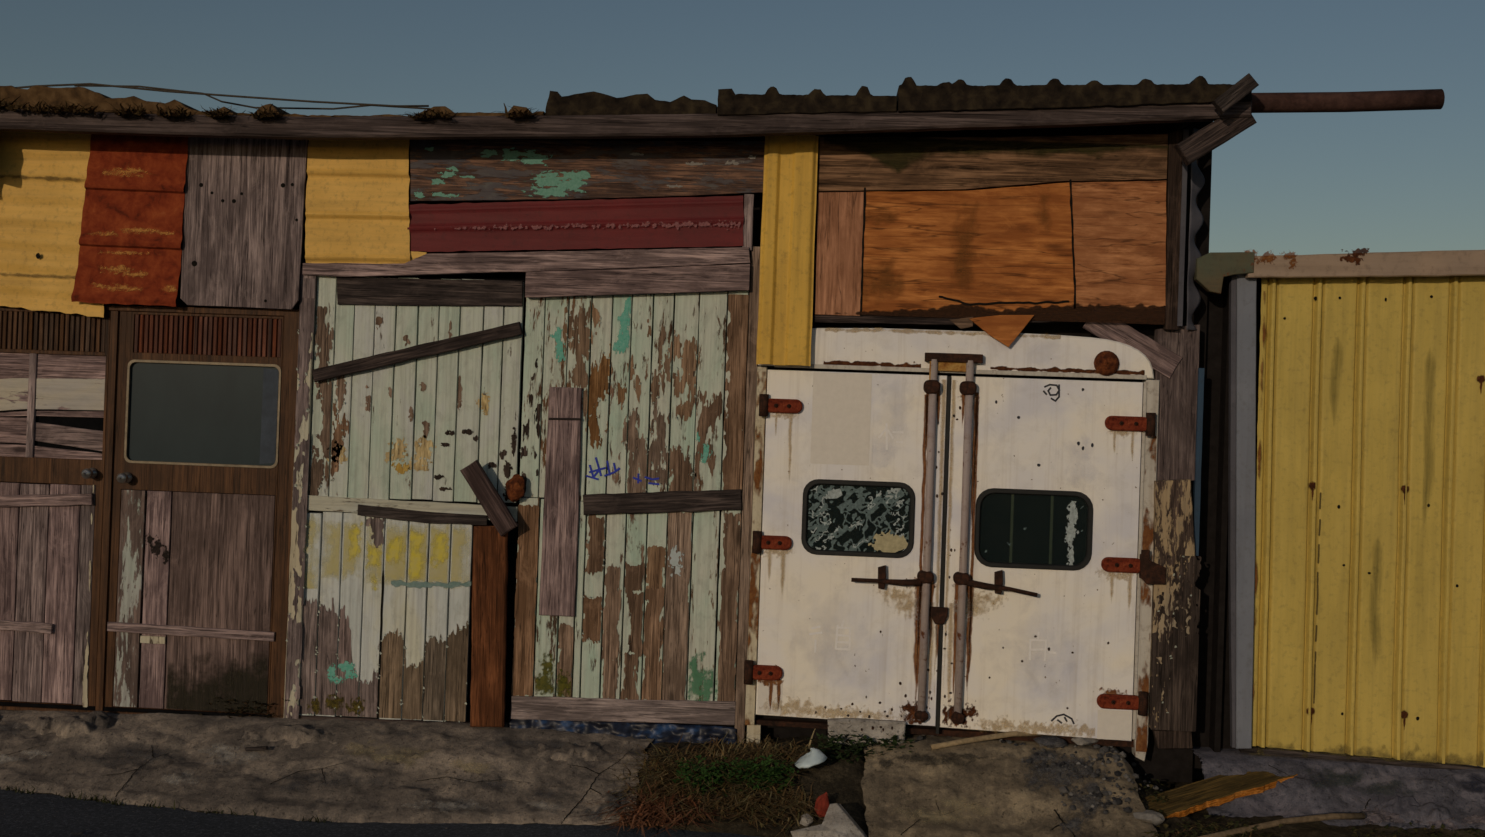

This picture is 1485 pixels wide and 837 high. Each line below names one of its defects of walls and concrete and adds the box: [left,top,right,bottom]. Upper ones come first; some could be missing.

peeling [414,166,475,200]
peeling [481,147,591,198]
corrosion [1245,250,1297,269]
corrosion [1340,248,1370,265]
leakage [166,658,268,713]
peeling [284,268,478,722]
peeling [488,358,541,696]
peeling [555,294,749,701]
corrosion [748,549,787,651]
corrosion [754,380,1088,743]
corrosion [1142,509,1153,560]
peeling [1149,555,1202,732]